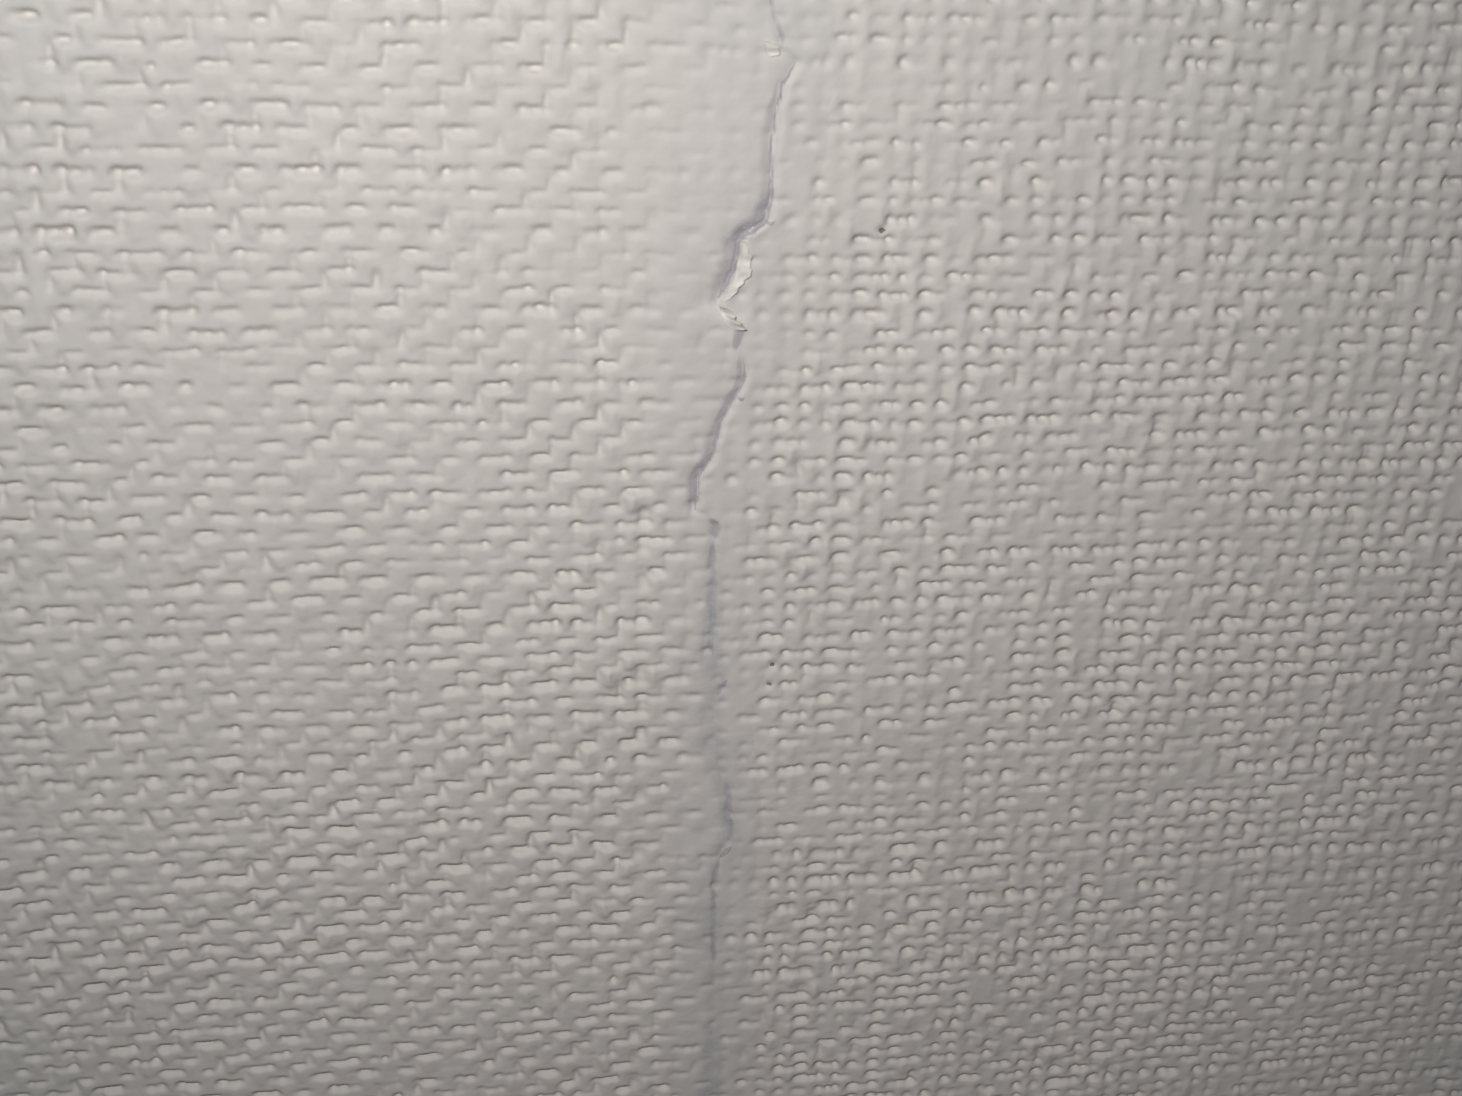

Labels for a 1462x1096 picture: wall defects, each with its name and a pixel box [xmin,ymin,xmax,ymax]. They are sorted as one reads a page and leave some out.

crack [715,63,795,305]
crack [691,365,746,534]